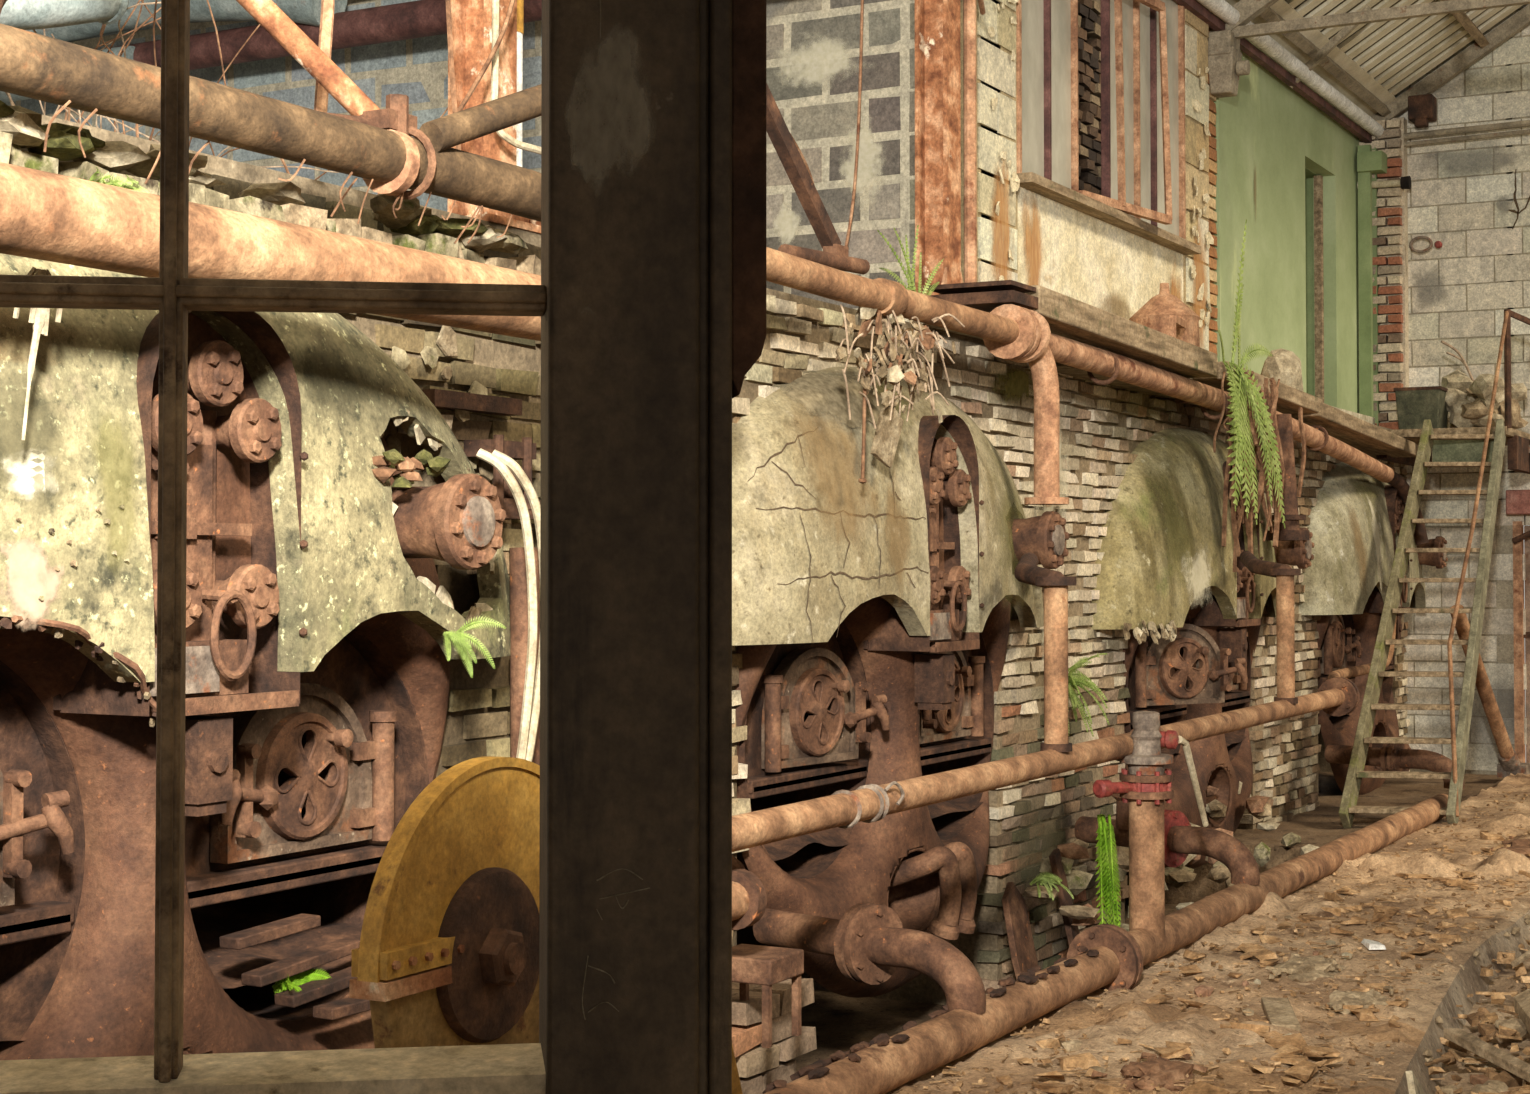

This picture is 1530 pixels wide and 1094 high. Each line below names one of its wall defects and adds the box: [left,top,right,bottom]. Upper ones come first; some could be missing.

peeling [1192,67,1214,249]
corrosion [993,172,1041,286]
corrosion [1171,234,1206,340]
peeling [1191,264,1212,328]
water stain [0,398,57,495]
crack [748,429,929,640]
water stain [1186,471,1222,599]